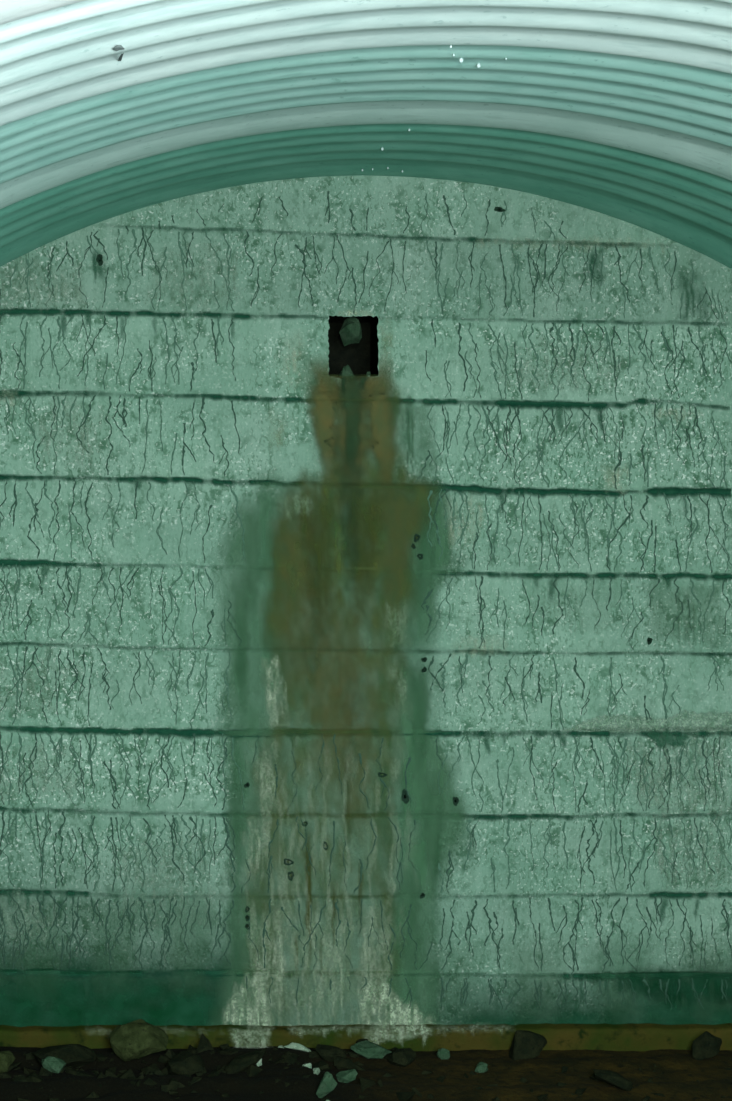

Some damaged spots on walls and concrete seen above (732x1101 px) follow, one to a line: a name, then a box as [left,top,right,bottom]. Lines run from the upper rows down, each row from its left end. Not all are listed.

rust [262,375,430,948]
crack [0,191,732,1011]
damp [360,659,463,1037]
damp [398,485,452,646]